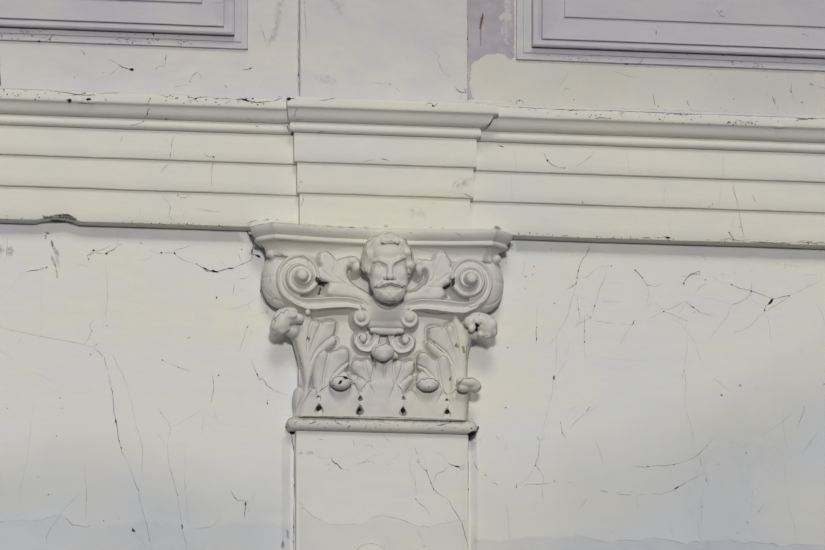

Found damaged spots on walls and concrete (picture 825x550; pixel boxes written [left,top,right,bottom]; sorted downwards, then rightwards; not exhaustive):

peeling [467,0,515,99]
crack [160,231,260,272]